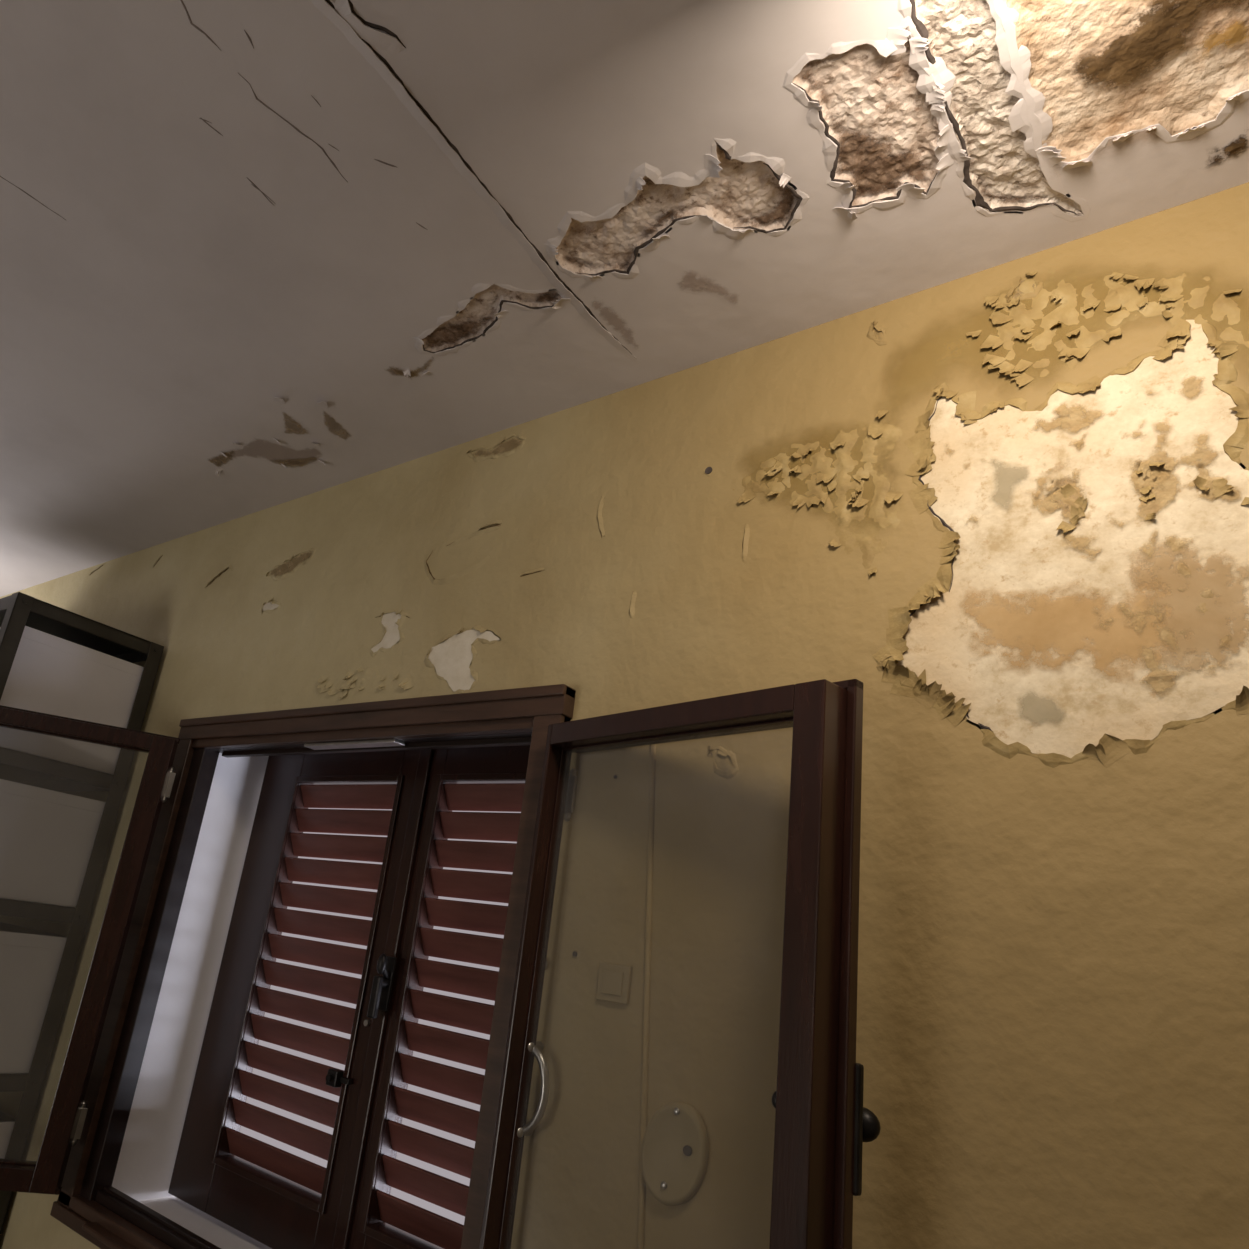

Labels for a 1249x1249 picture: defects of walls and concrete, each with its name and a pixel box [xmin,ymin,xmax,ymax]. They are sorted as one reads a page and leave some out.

crack [180,0,219,48]
water stain [1073,0,1249,89]
crack [238,30,347,181]
flaking render [782,0,1249,223]
crack [0,176,64,219]
crack [247,178,273,204]
crack [310,0,637,361]
spalling [544,138,810,282]
spalling [390,282,571,377]
peeling [272,397,326,468]
peeling [872,318,1249,768]
peeling [424,625,500,694]